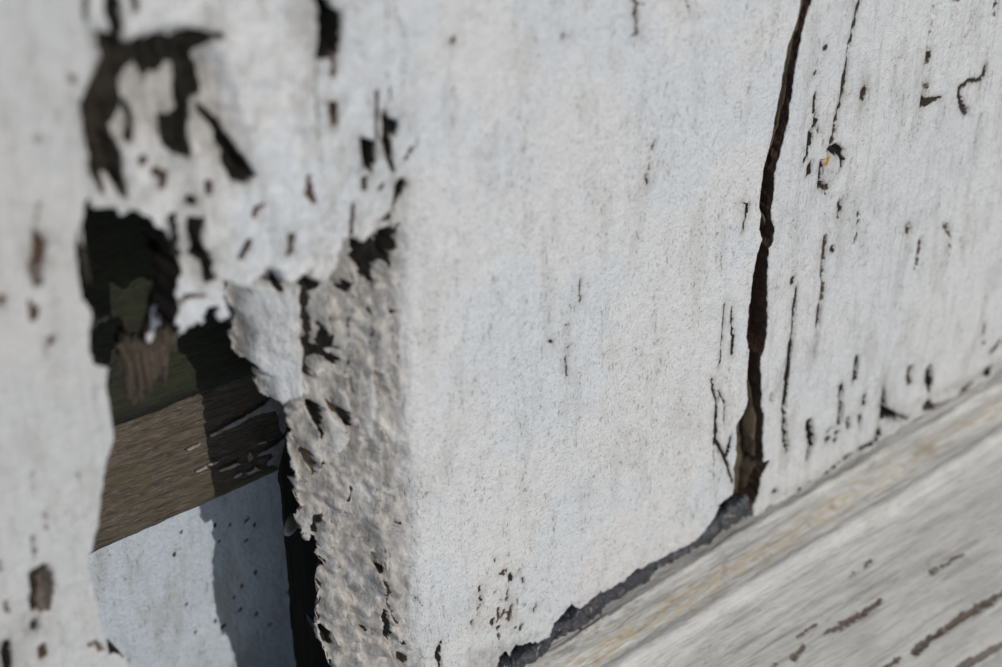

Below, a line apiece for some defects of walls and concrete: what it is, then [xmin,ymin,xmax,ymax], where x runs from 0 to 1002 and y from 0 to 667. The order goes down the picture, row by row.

spalling [77,0,260,202]
crack [767,0,803,155]
crack [802,0,863,180]
spalling [302,172,319,208]
spalling [347,198,357,238]
crack [740,199,765,235]
peeling [165,176,307,405]
spalling [332,276,351,293]
peeling [316,369,405,455]
crack [709,296,758,493]
peeling [196,438,285,479]